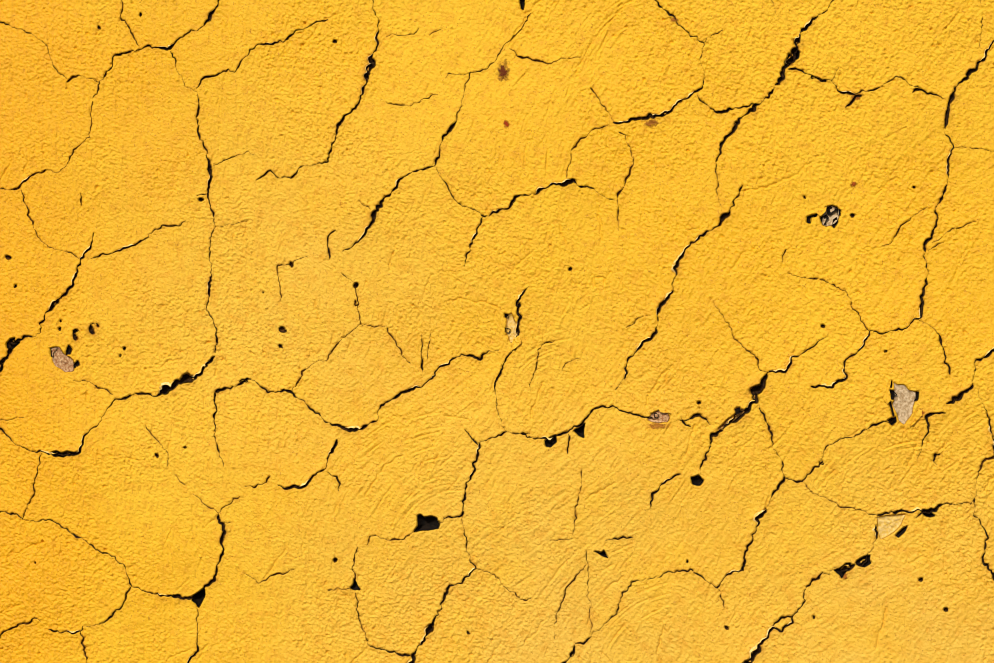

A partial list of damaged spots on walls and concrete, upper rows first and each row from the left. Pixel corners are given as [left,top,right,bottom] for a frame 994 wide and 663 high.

flaking render [807,205,855,228]
flaking render [51,323,99,372]
crack [0,0,488,663]
crack [327,0,994,663]
flaking render [648,409,670,423]
flaking render [880,380,922,426]
spalling [414,515,439,532]
flaking render [877,515,907,539]